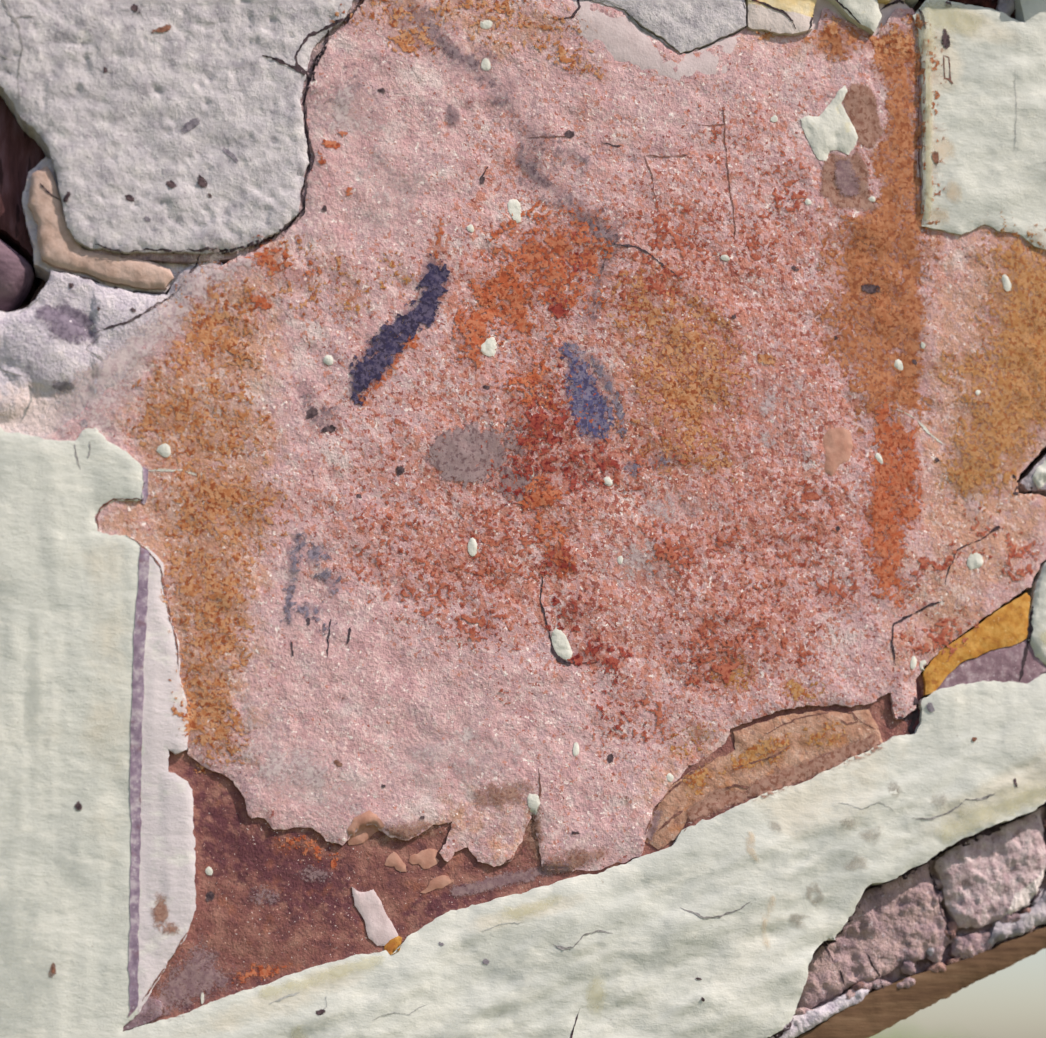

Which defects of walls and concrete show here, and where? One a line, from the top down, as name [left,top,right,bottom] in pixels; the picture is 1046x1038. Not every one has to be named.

spalling [22,157,190,295]
crack [86,0,364,360]
corrosion [123,235,420,774]
corrosion [452,13,1046,822]
peeling [667,656,935,787]
corrosion [278,835,341,868]
peeling [123,749,675,1032]
corrosion [474,783,604,874]
crack [680,902,750,919]
spalling [770,807,1046,1038]
crack [815,802,1046,984]
crack [768,1018,794,1038]